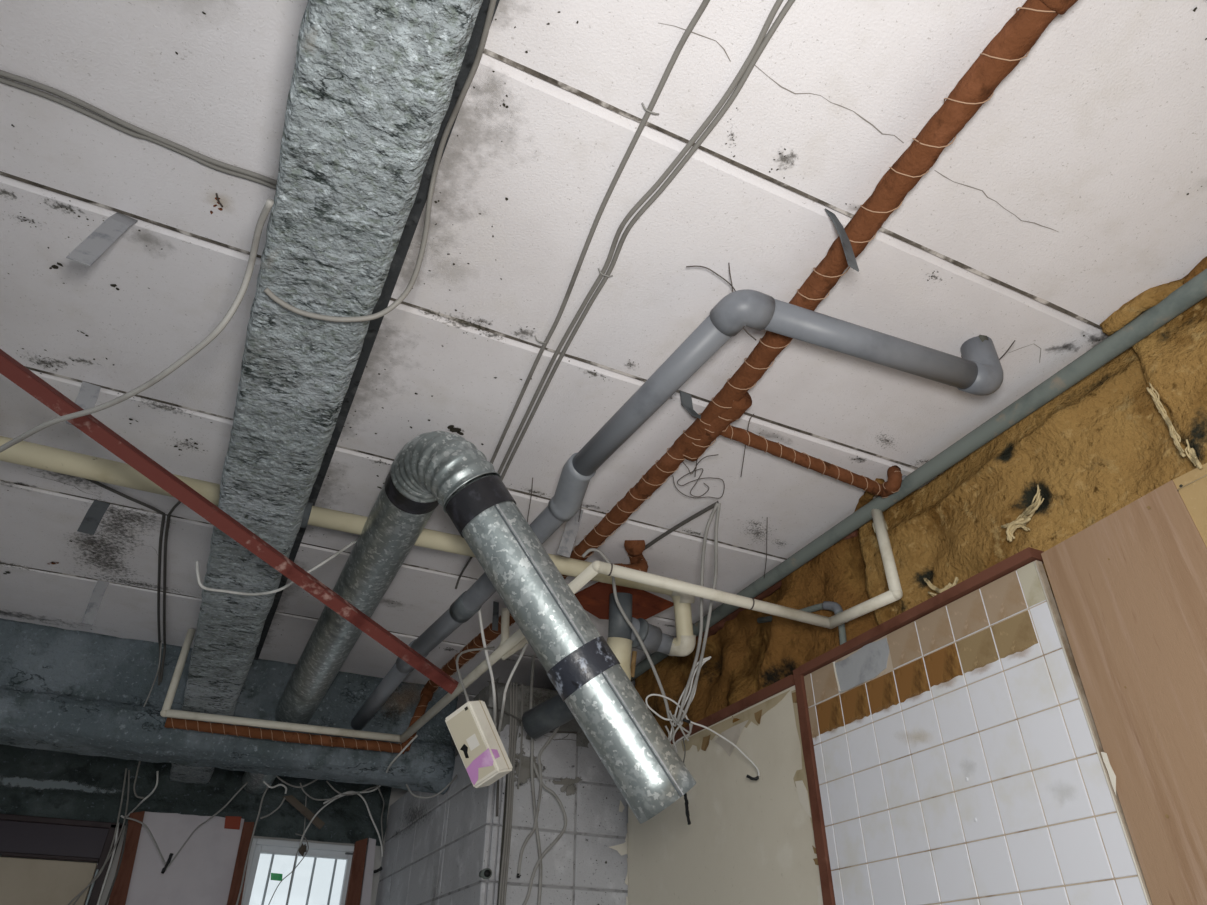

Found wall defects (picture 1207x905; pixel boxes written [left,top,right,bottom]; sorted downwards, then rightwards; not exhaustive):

crack [660,23,904,143]
crack [935,170,1058,232]
water stain [68,496,178,590]
peeling [833,638,889,693]